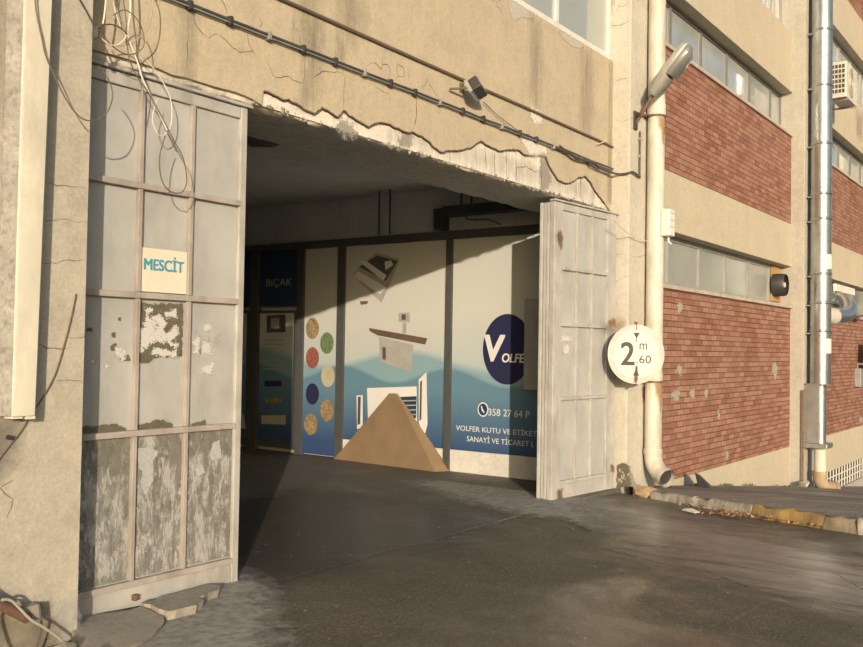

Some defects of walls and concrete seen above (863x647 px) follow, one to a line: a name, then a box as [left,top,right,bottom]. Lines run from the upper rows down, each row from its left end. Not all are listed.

crack [229,24,340,83]
crack [368,63,438,131]
spalling [247,135,280,147]
spalling [252,90,605,210]
peeling [110,302,184,364]
peeling [78,419,232,591]
damp [411,480,863,616]
damp [136,570,291,647]